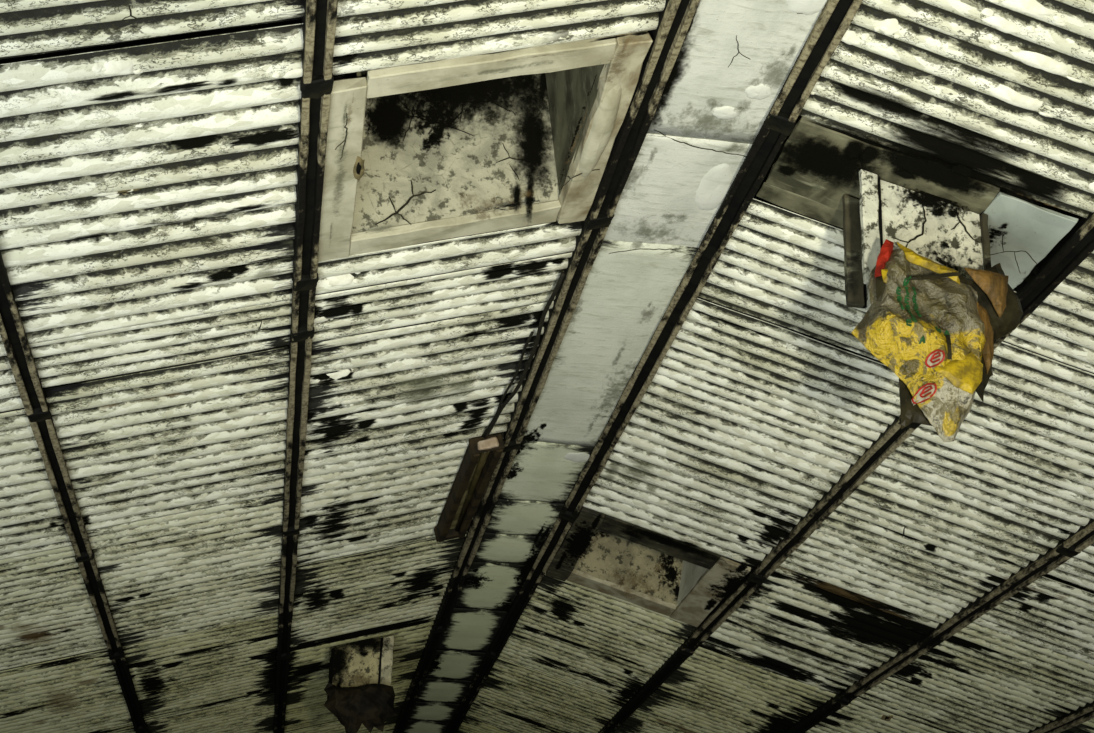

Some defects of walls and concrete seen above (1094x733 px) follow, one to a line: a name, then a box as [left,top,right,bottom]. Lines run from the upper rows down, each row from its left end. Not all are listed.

water stain [364,73,553,221]
water stain [775,83,1068,219]
water stain [310,369,353,388]
water stain [305,404,378,457]
water stain [443,393,511,438]
water stain [300,496,380,544]
water stain [521,588,589,649]
water stain [619,507,937,673]
water stain [1002,586,1055,613]
water stain [530,654,660,715]
water stain [699,636,850,691]
water stain [885,636,1006,688]